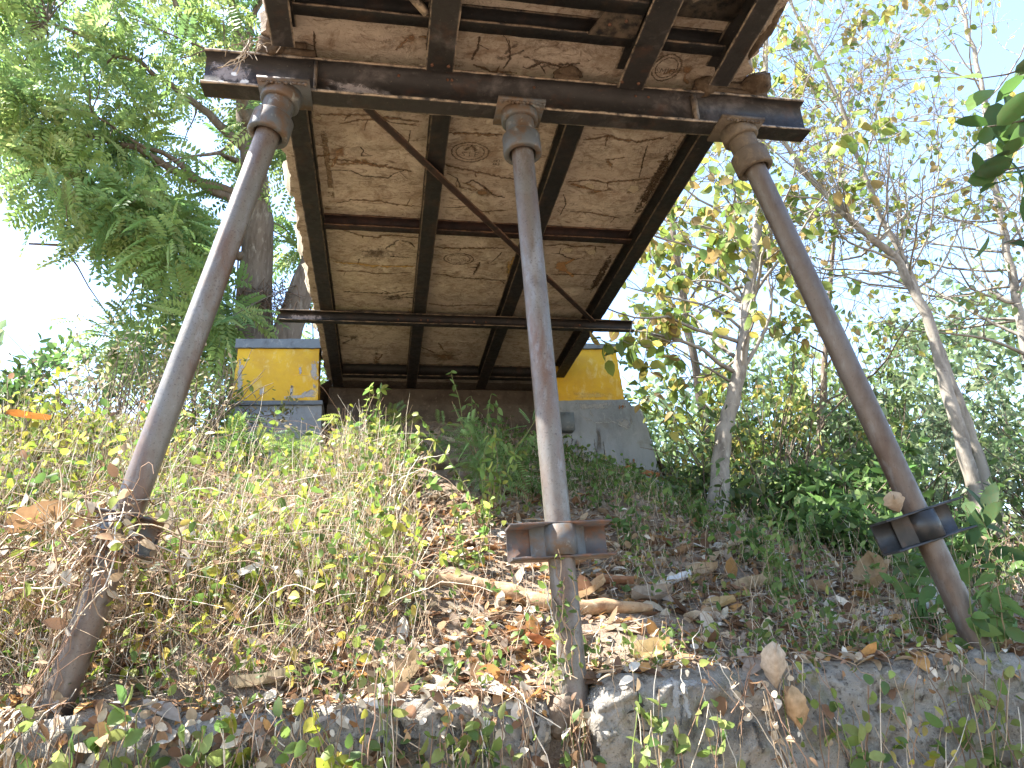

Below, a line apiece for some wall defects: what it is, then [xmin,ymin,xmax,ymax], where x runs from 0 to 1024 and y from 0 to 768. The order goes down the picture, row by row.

crack [471,35,561,74]
crack [320,113,419,207]
crack [443,164,514,213]
crack [545,135,664,276]
crack [333,230,506,306]
peeling [284,361,319,399]